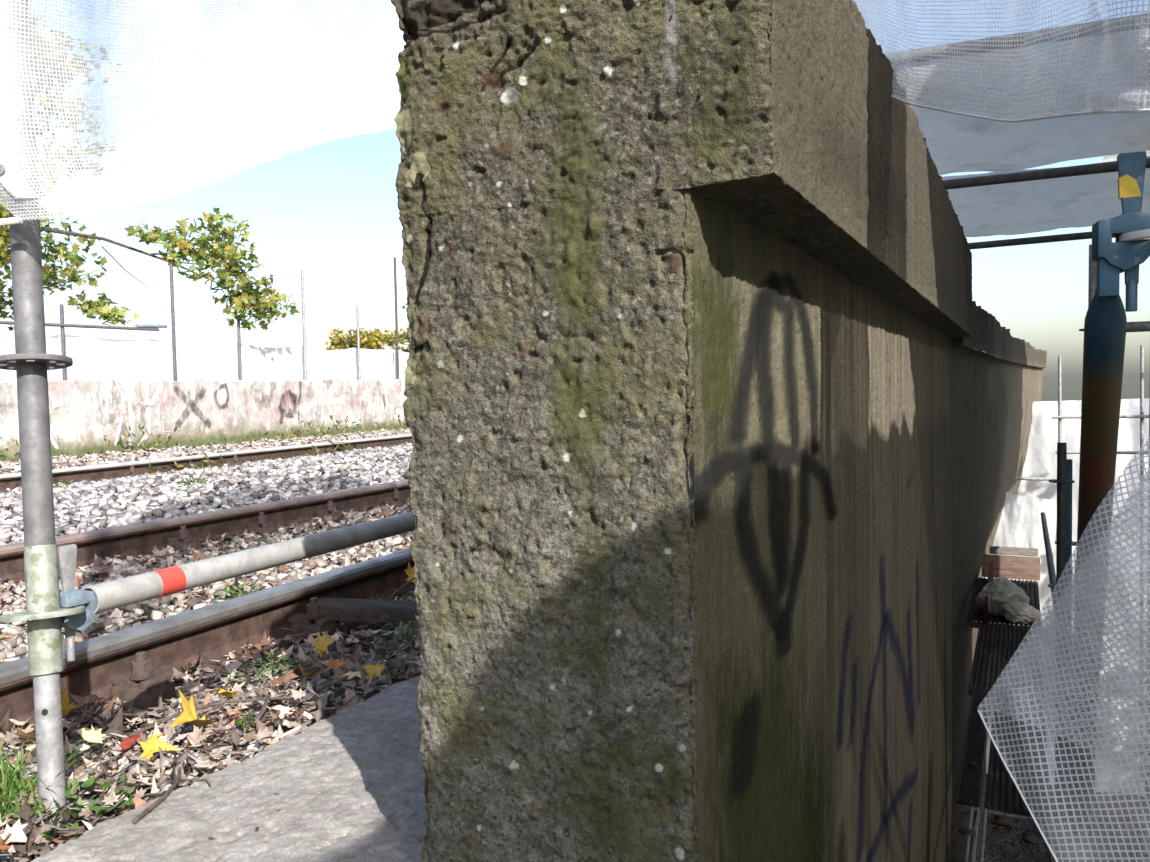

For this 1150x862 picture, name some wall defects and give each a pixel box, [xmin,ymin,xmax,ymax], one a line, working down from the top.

crack [405,0,538,91]
crack [414,176,433,304]
crack [414,342,430,353]